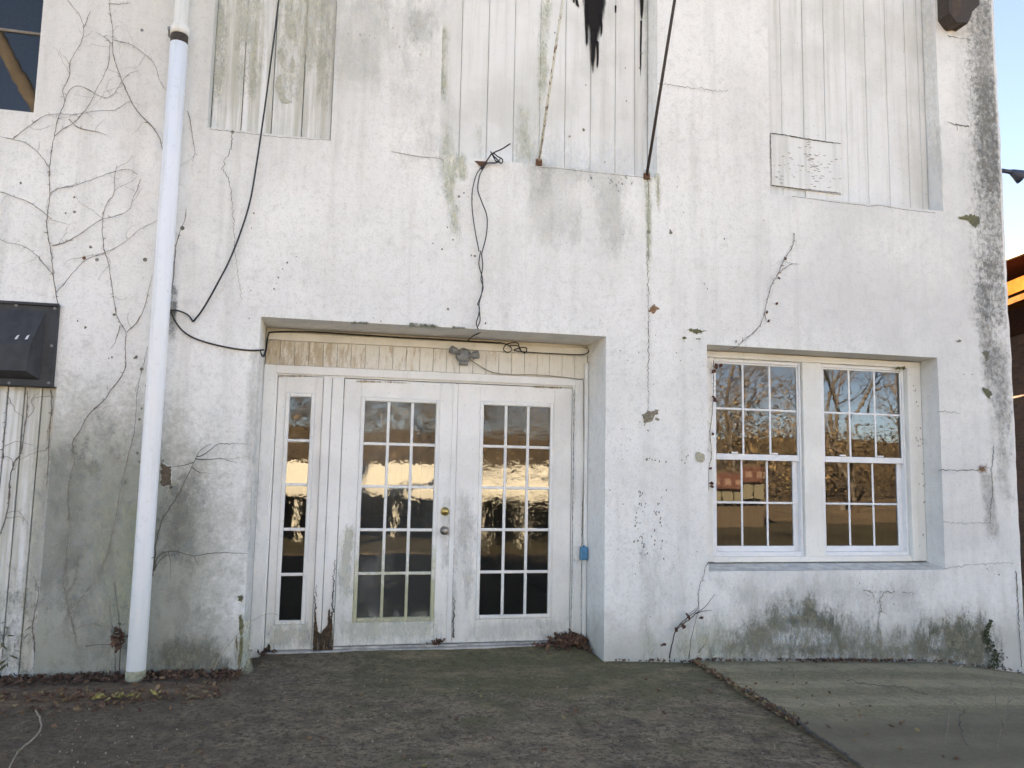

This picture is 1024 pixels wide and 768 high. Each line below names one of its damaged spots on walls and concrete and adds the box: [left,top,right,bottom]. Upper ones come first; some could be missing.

peeling [958,213,980,228]
water stain [971,9,1010,420]
crack [539,167,660,408]
peeling [642,409,659,432]
peeling [160,460,172,489]
water stain [710,598,1002,667]